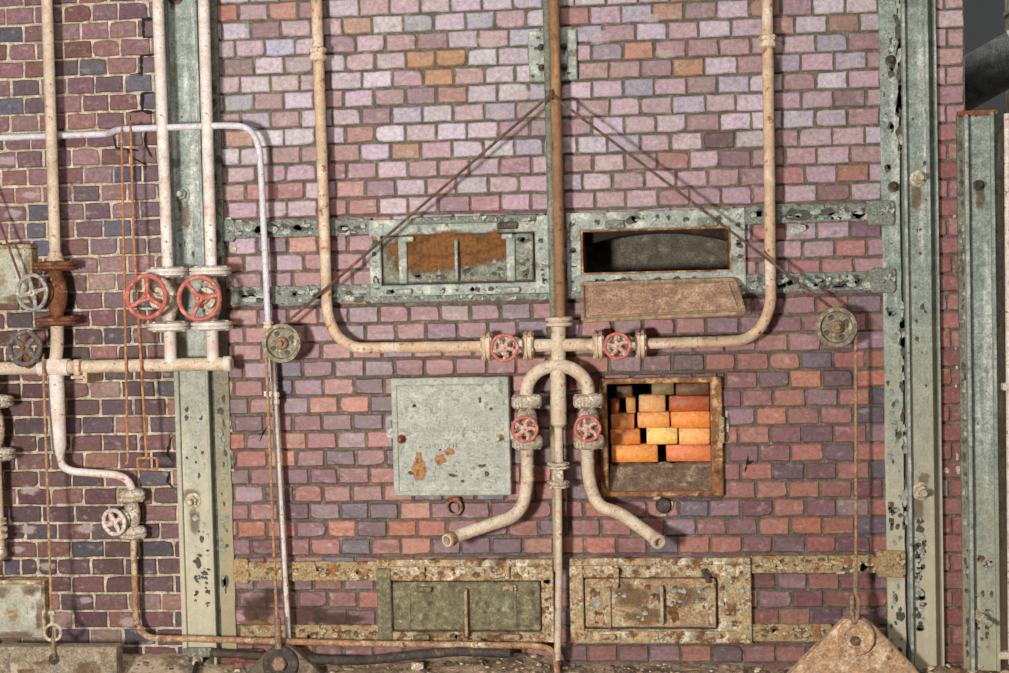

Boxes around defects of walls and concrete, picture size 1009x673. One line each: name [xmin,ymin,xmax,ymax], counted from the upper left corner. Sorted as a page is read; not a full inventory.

peeling [883,0,914,173]
corrosion [388,230,506,273]
peeling [217,395,236,476]
corrosion [412,448,454,480]
peeling [885,301,927,651]
peeling [192,493,229,607]
corrosion [667,605,679,622]